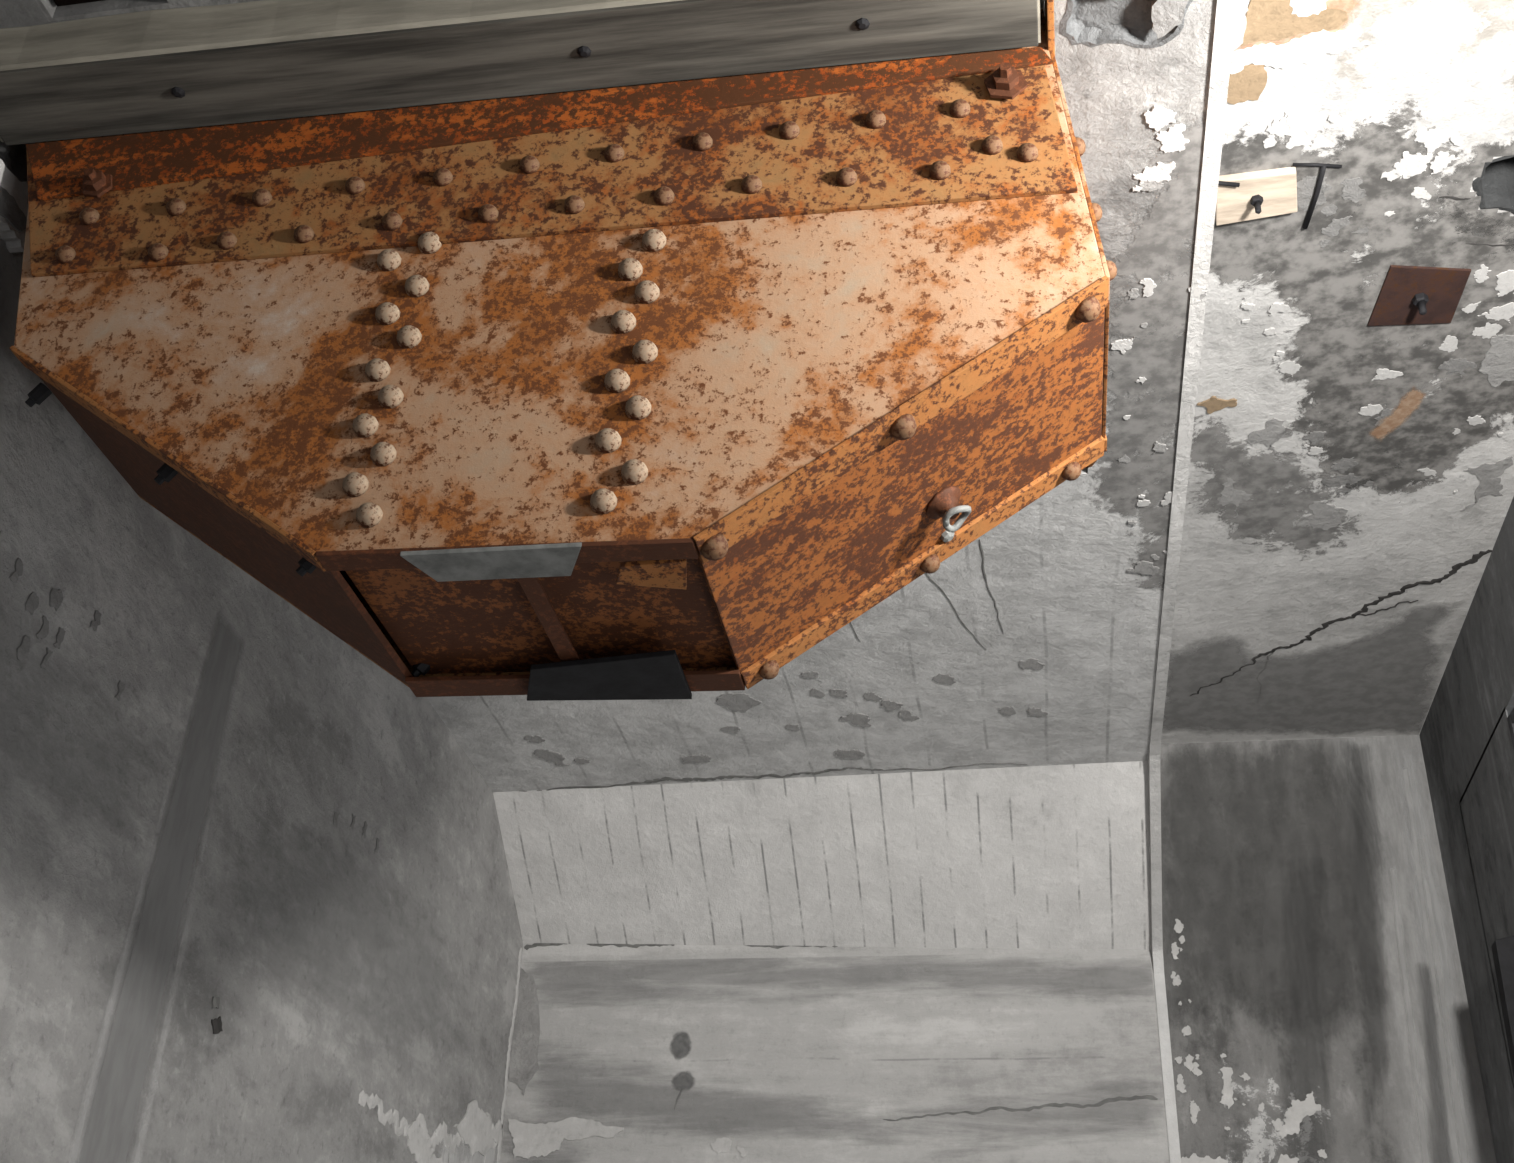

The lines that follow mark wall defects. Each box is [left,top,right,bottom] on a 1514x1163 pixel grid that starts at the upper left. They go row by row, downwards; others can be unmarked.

spalling [1059,0,1193,48]
peeling [1230,0,1369,74]
peeling [1083,100,1514,591]
crack [1190,549,1492,705]
peeling [801,671,919,727]
peeling [932,674,956,685]
water stain [1163,607,1446,733]
peeling [524,735,591,766]
peeling [1170,919,1192,1005]
water stain [671,1032,694,1110]
crack [883,1095,1158,1121]
peeling [1174,1053,1331,1163]